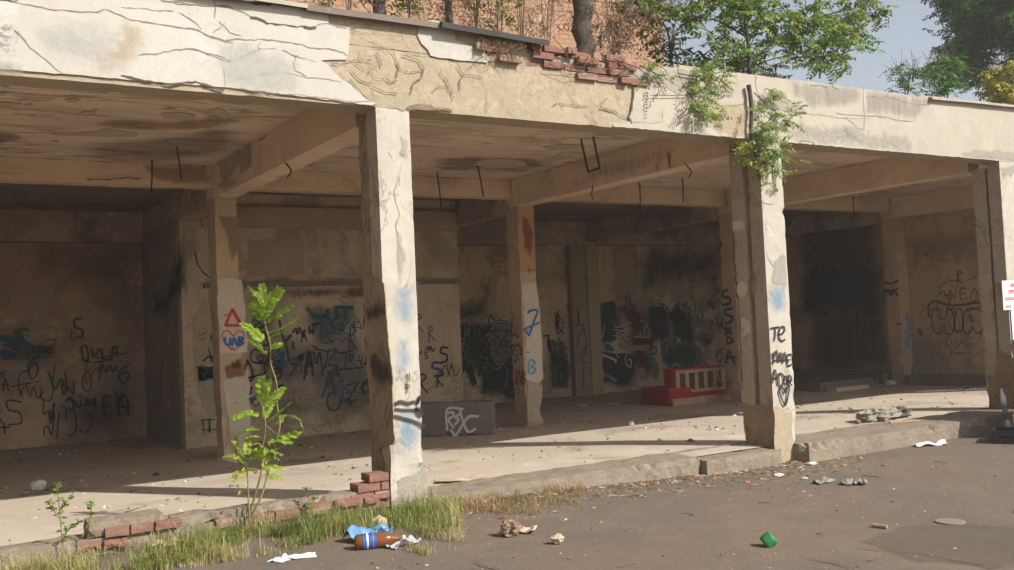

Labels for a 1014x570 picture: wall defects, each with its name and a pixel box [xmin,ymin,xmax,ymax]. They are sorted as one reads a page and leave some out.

crack [0,0,503,134]
flaking render [473,42,692,95]
leakage [106,119,232,129]
crack [553,87,663,123]
peeling [737,276,757,298]
peeling [741,316,751,337]
peeling [193,277,276,455]
flaking render [743,403,794,477]